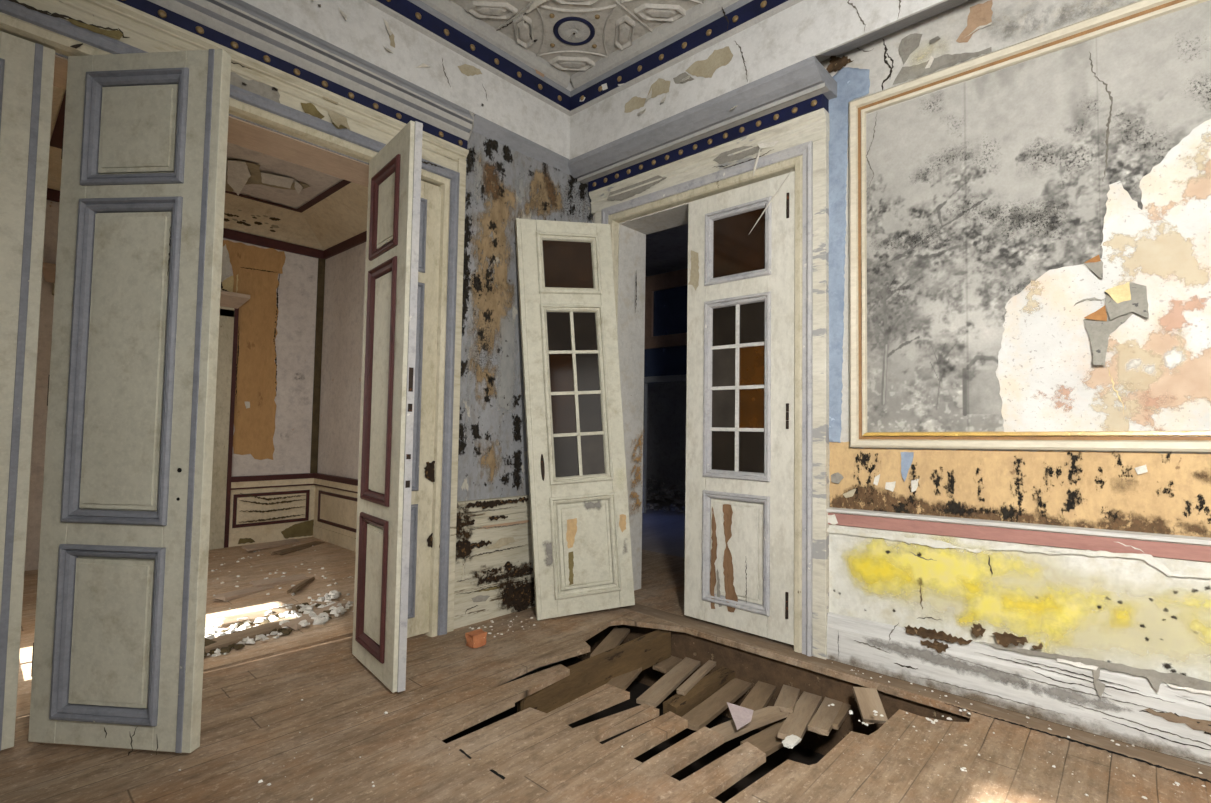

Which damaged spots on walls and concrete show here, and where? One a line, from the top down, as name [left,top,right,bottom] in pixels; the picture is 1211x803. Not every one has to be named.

peeling [624,46,733,115]
crack [846,0,901,192]
crack [1089,52,1113,181]
peeling [224,210,280,232]
peeling [225,159,310,195]
peeling [1083,256,1149,365]
peeling [456,497,529,559]
spalling [472,501,601,612]
damp [849,540,1098,639]
damp [829,451,1211,538]
peeling [854,622,1211,710]